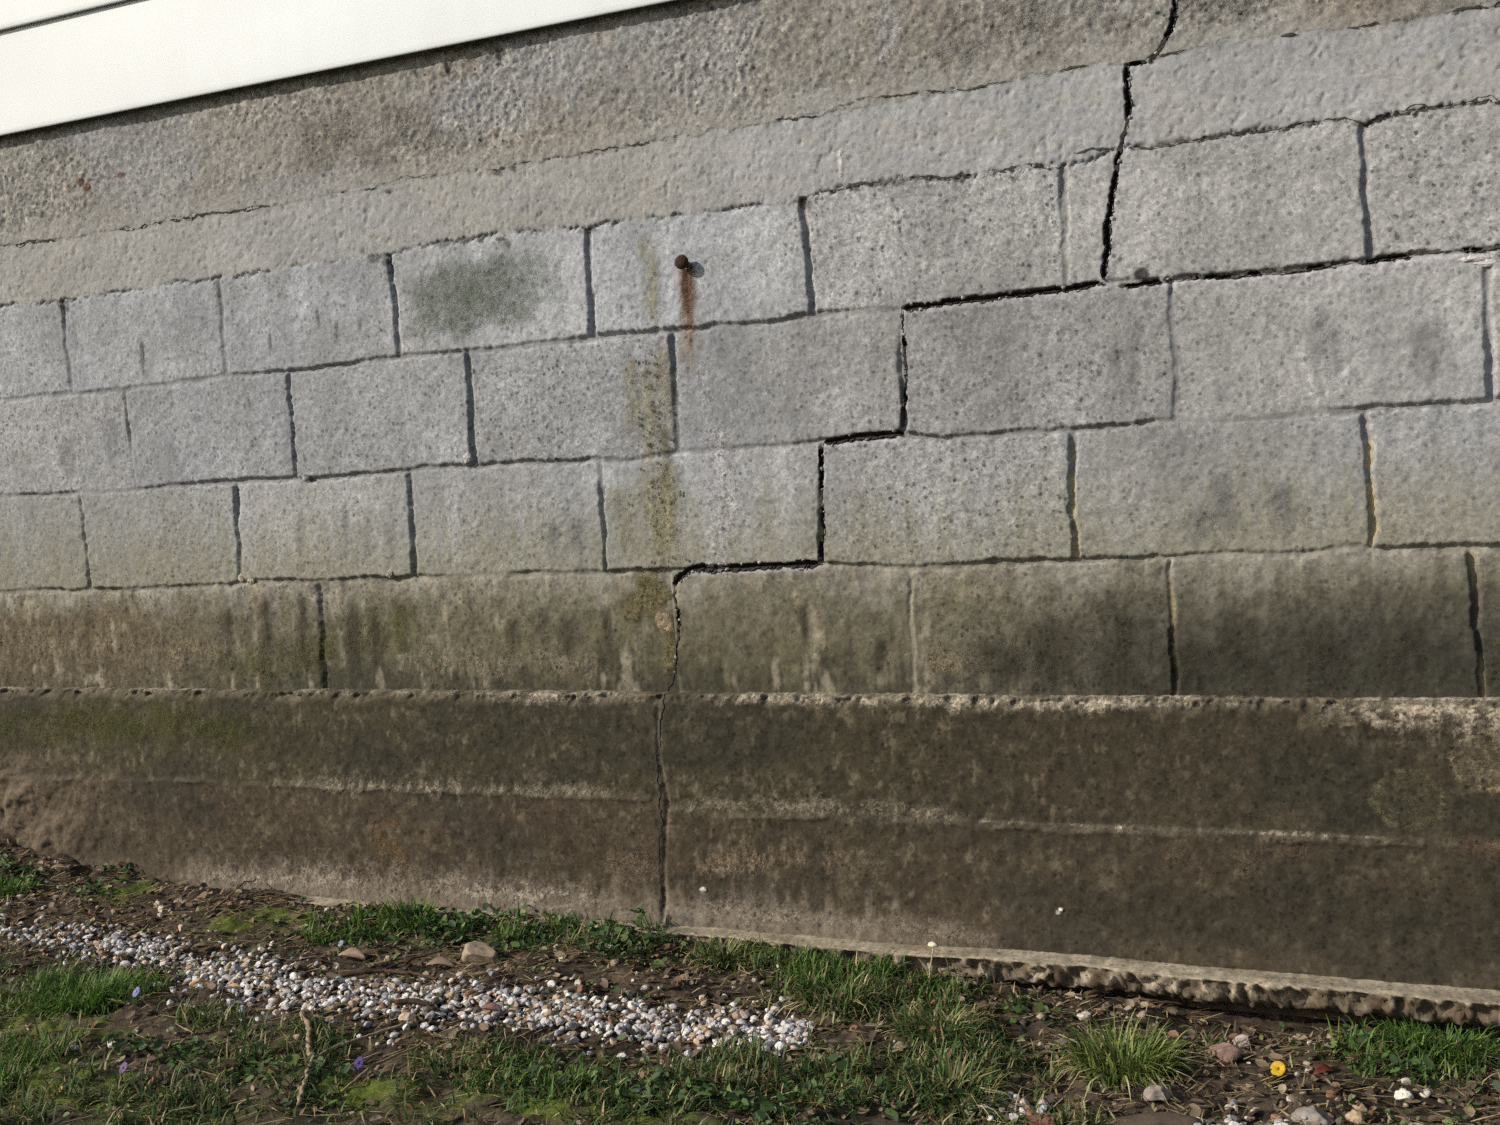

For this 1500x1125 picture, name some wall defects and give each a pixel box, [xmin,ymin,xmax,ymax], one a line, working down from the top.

crack [492,137,680,171]
rust [681,264,694,354]
crack [666,0,1500,691]
damp [479,690,625,703]
damp [725,667,1201,712]
damp [1343,697,1500,779]
damp [203,863,591,917]
damp [706,902,831,925]